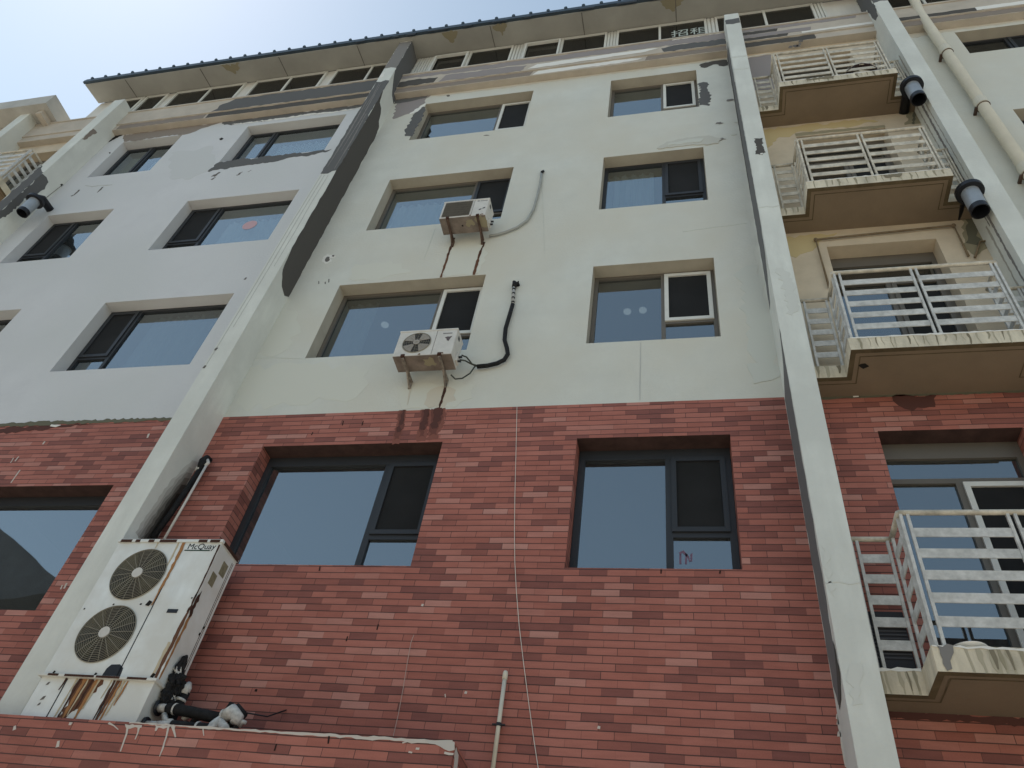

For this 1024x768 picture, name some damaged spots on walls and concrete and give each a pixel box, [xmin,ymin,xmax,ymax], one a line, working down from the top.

spalling [109,0,894,308]